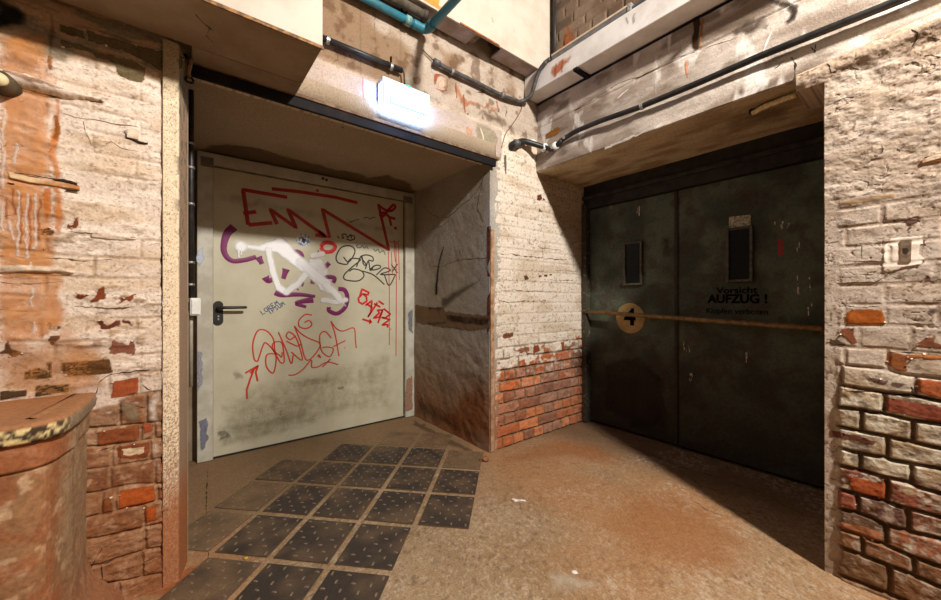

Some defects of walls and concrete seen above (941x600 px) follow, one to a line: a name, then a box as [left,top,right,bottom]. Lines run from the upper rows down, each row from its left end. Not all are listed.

crack [23,90,139,152]
peeling [74,287,106,302]
peeling [98,320,139,331]
flaking render [827,309,886,346]
flaking render [0,340,138,400]
flaking render [886,337,941,371]
flaking render [868,377,941,422]
peeling [830,430,875,444]
flaking render [838,475,886,510]